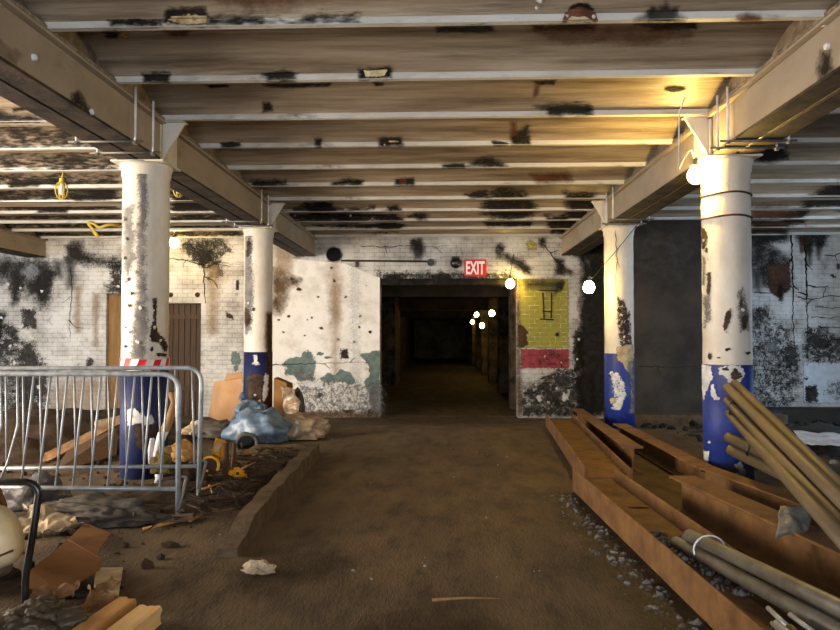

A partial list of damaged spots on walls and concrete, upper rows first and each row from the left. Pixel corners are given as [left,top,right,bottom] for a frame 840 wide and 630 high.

leakage [9,276,24,306]
leakage [35,259,80,326]
leakage [193,248,223,331]
peeling [701,227,711,328]
leakage [799,236,821,265]
crack [790,235,840,345]
peeling [282,339,386,418]
peeling [609,297,635,414]
peeling [702,287,840,407]